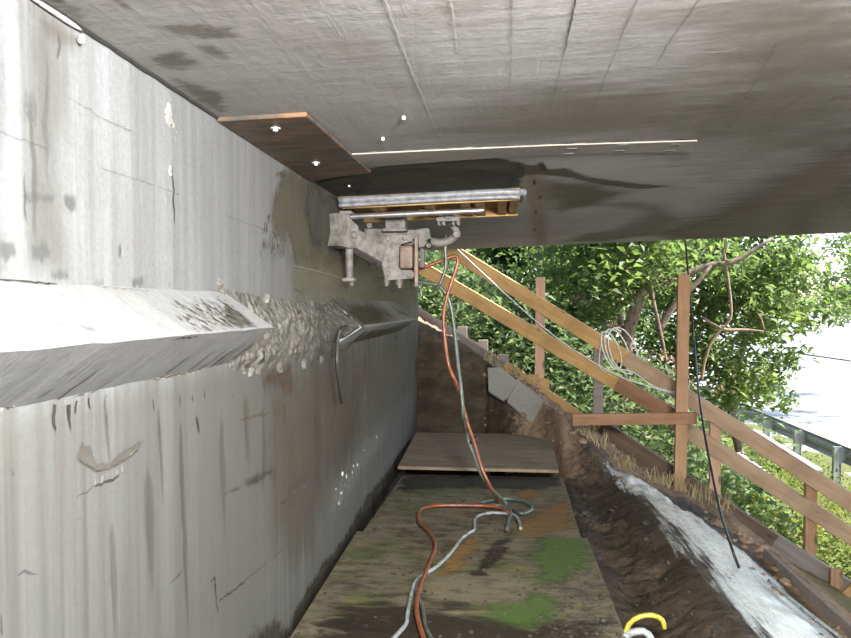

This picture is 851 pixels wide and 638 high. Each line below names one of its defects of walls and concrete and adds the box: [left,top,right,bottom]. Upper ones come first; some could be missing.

crack [565,0,576,49]
crack [165,102,175,129]
crack [168,165,176,222]
damp [2,242,14,259]
damp [262,158,662,343]
damp [176,300,254,331]
spalling [216,278,364,404]
spalling [78,442,141,489]
crack [211,576,246,613]